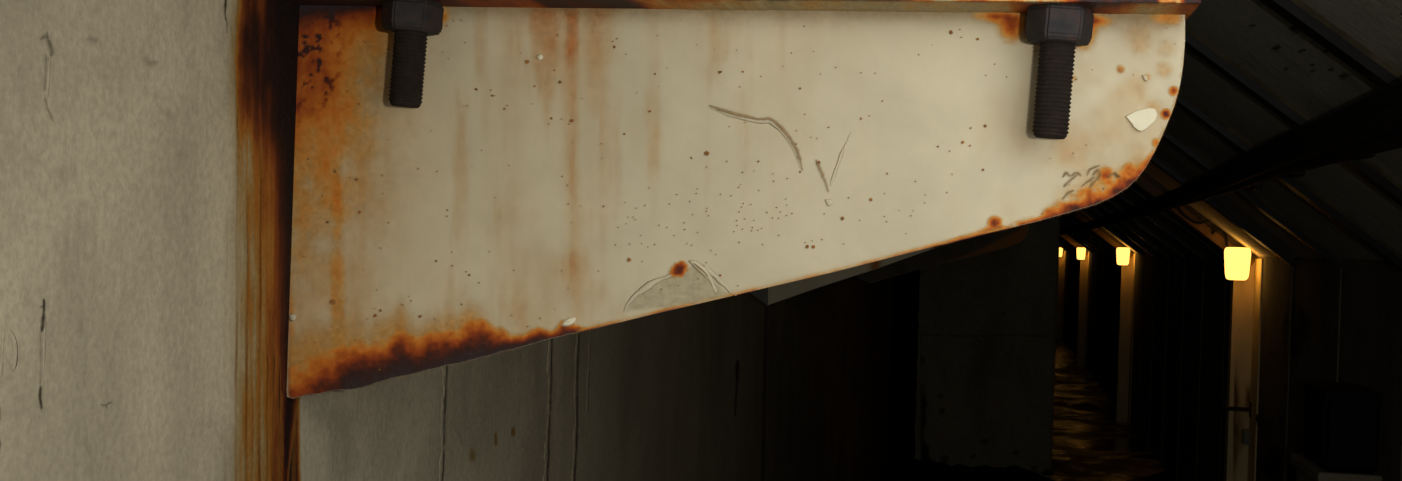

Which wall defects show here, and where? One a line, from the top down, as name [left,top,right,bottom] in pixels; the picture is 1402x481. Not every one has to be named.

corrosion [1160,86,1178,119]
corrosion [234,0,620,481]
corrosion [858,138,1160,283]